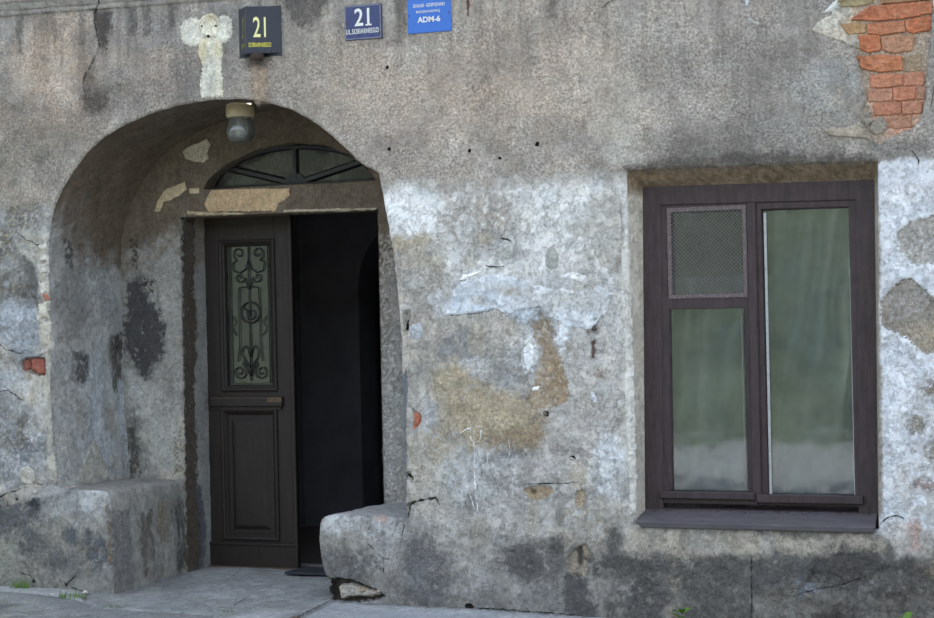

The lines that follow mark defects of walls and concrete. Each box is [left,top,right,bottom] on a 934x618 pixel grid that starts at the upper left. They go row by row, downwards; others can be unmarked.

crack [80,0,107,116]
flaking render [812,0,934,146]
peeling [897,215,934,266]
flaking render [22,357,46,376]
peeling [38,243,52,346]
peeling [154,182,376,572]
peeling [446,271,613,416]
peeling [880,278,934,354]
crack [402,497,440,536]
damp [503,541,596,617]
damp [584,553,673,618]
damp [684,549,817,618]